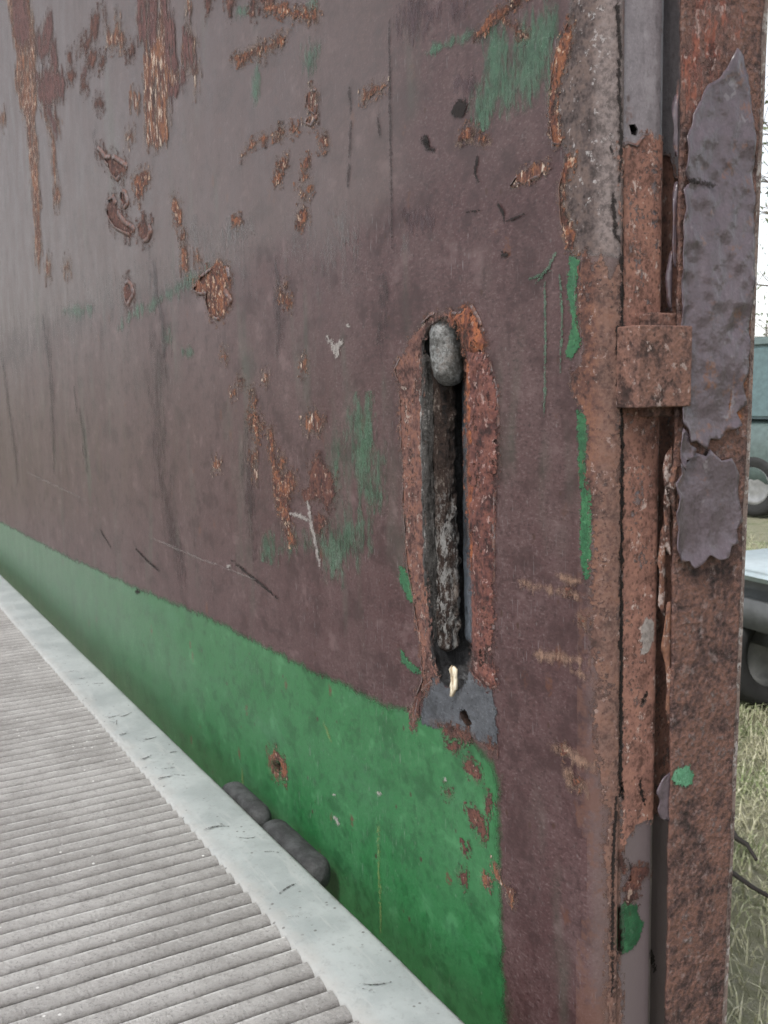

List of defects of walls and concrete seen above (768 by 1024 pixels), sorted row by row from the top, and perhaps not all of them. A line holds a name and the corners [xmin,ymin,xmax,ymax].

corrosion [0,0,274,288]
corrosion [271,80,329,235]
peeling [509,156,553,190]
corrosion [218,346,339,551]
corrosion [392,301,502,732]
corrosion [522,0,743,1024]
corrosion [266,742,288,790]